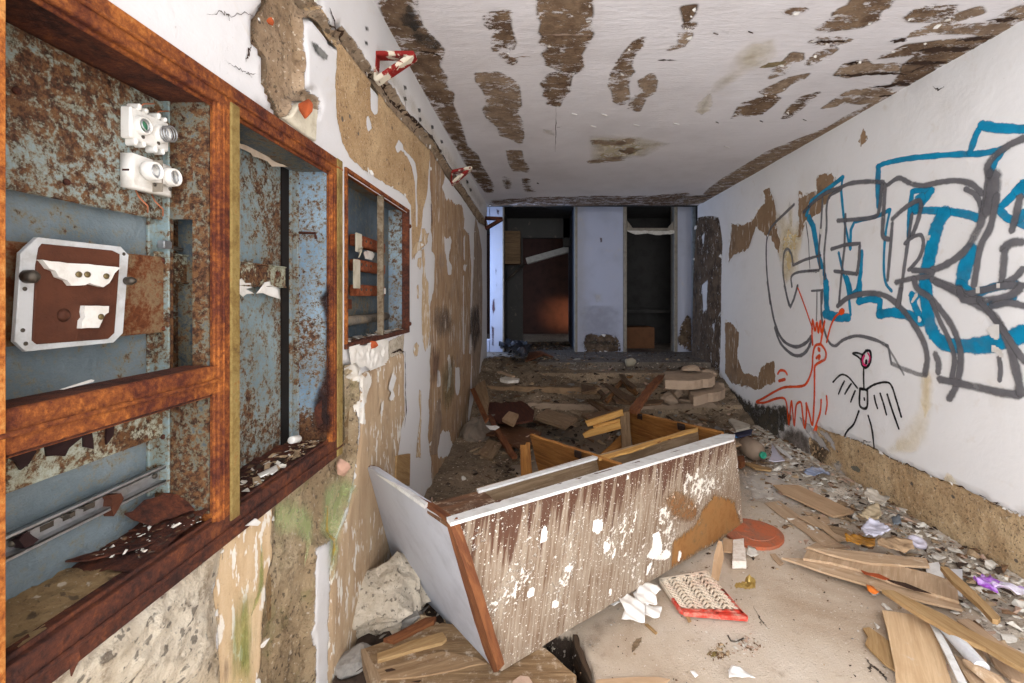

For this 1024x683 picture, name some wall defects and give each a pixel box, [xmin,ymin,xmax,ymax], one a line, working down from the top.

crack [209,10,255,75]
peeling [250,0,1024,482]
corrosion [315,287,331,433]
spalling [53,334,405,683]
spalling [809,427,1024,579]